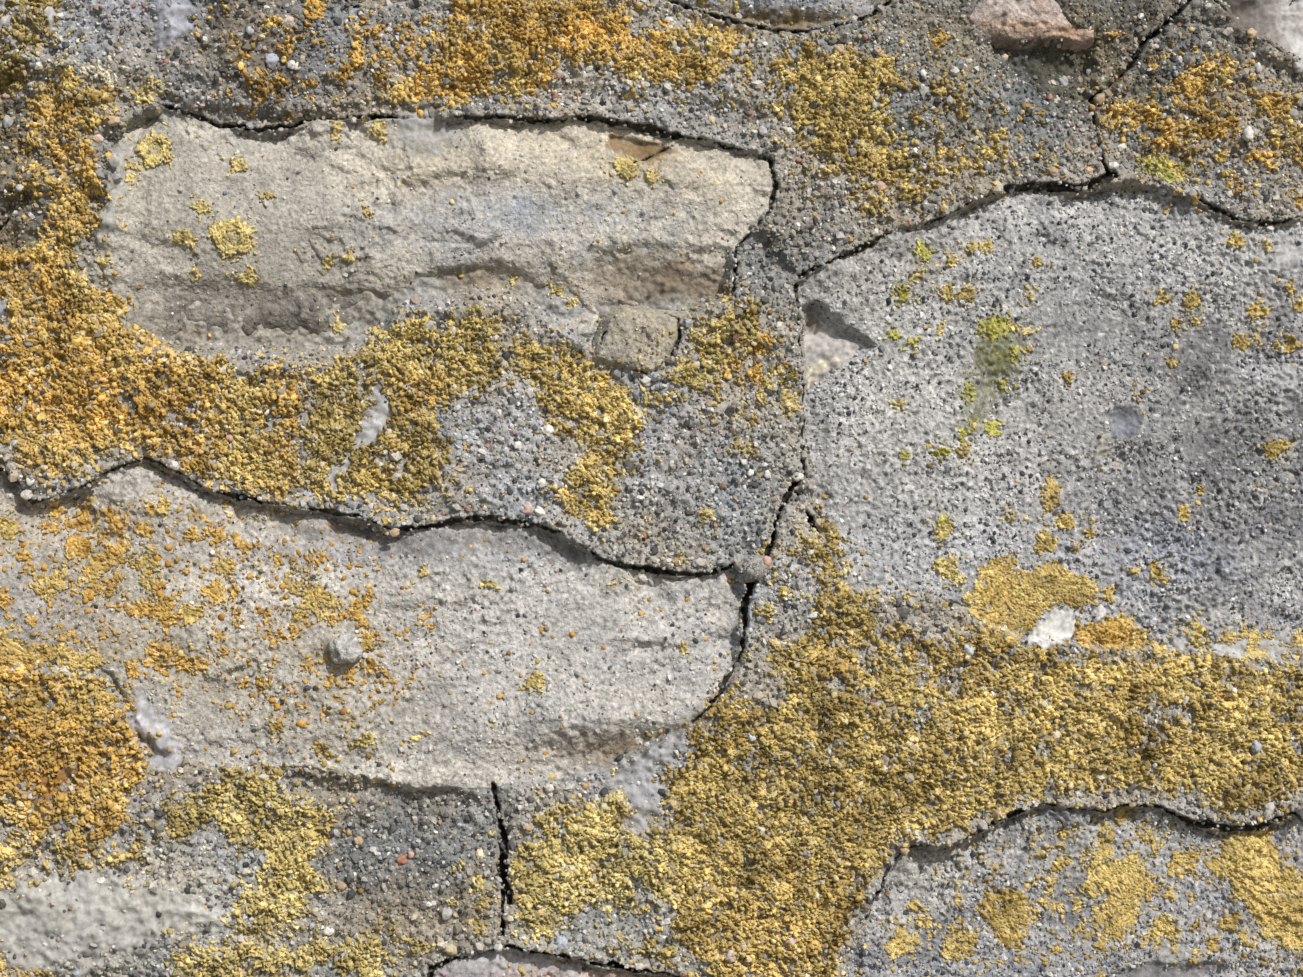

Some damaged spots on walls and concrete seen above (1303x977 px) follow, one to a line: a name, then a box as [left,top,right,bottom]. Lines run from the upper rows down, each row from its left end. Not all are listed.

crack [924,0,1285,225]
crack [1199,199,1300,227]
crack [0,232,891,724]
crack [427,783,680,977]